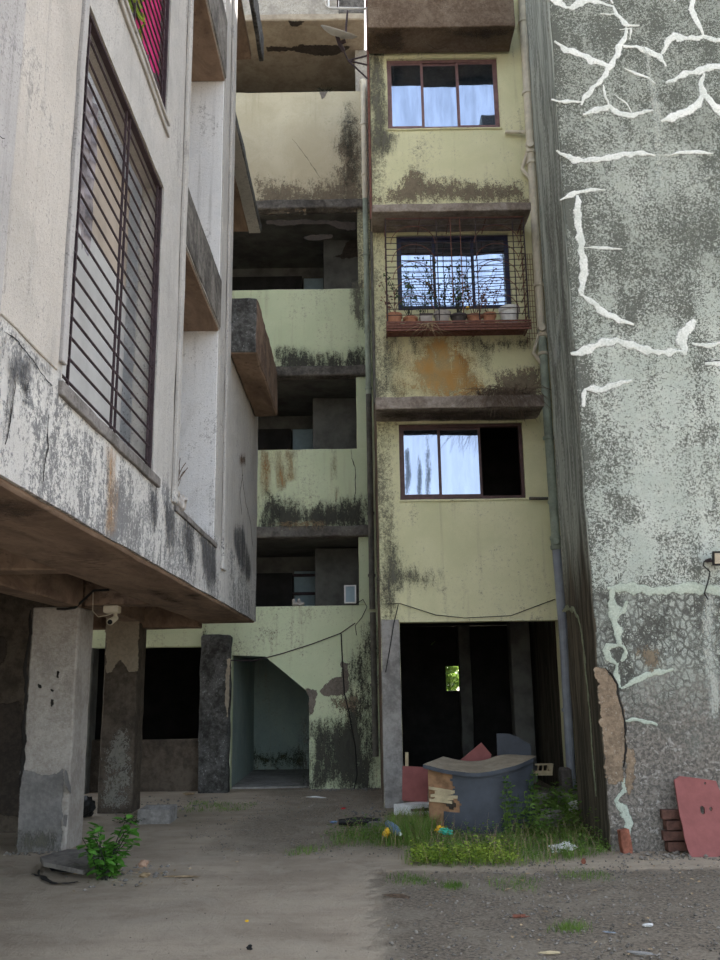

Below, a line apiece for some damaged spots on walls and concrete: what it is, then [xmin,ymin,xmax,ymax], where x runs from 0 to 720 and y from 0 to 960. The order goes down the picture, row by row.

crack [550,0,720,122]
damp [254,31,529,215]
crack [556,150,713,164]
crack [560,188,720,367]
damp [275,346,365,366]
damp [151,489,216,588]
damp [258,492,368,527]
damp [376,539,434,620]
peeling [105,617,140,673]
mould [253,623,380,789]
peeling [306,662,350,715]
flaking render [593,667,636,795]